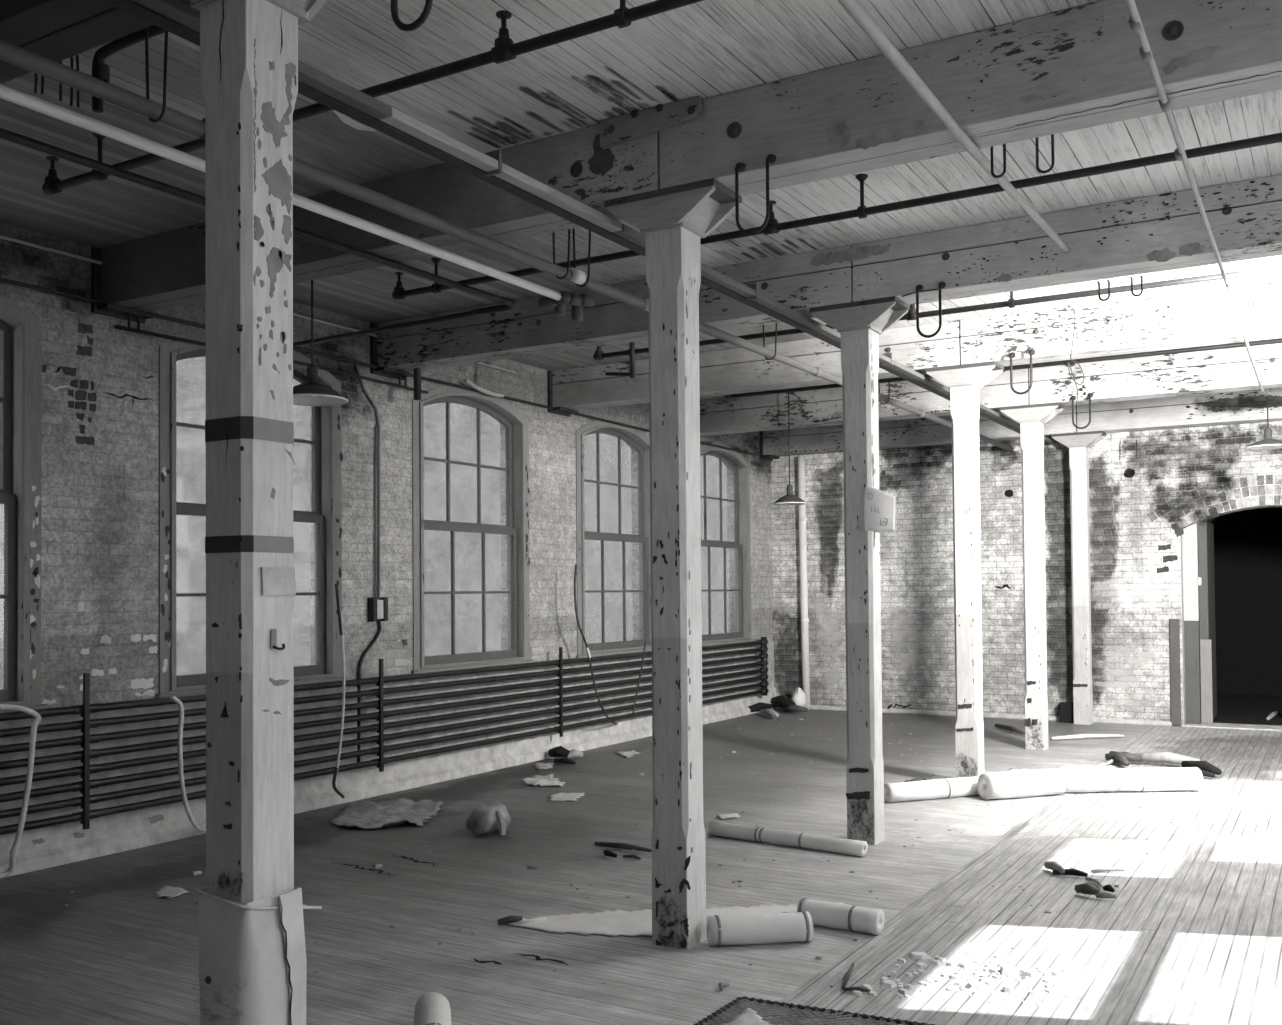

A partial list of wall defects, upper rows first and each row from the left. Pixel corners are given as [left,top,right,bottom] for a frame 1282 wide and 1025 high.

damp [449,68,679,148]
crack [944,71,1282,142]
peeling [236,39,296,373]
peeling [1095,181,1274,262]
flaking render [42,324,96,445]
peeling [1186,394,1282,419]
damp [1123,424,1282,522]
damp [813,461,844,595]
peeling [21,486,41,689]
peeling [130,510,170,697]
peeling [846,791,874,845]
peeling [655,847,693,949]